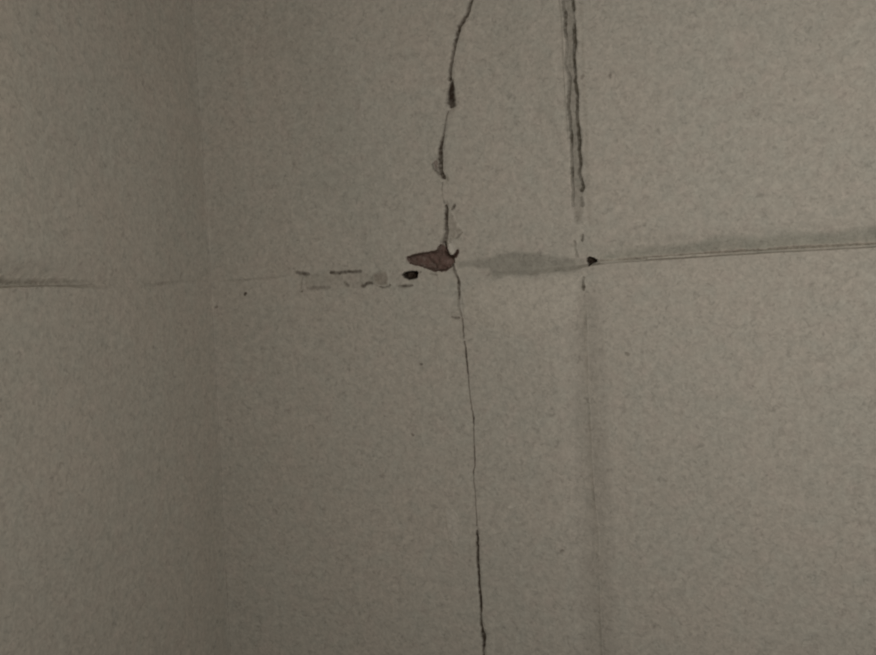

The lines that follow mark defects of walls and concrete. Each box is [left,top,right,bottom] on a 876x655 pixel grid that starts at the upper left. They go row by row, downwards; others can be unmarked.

crack [559,0,586,208]
spalling [295,241,459,293]
crack [431,0,488,655]